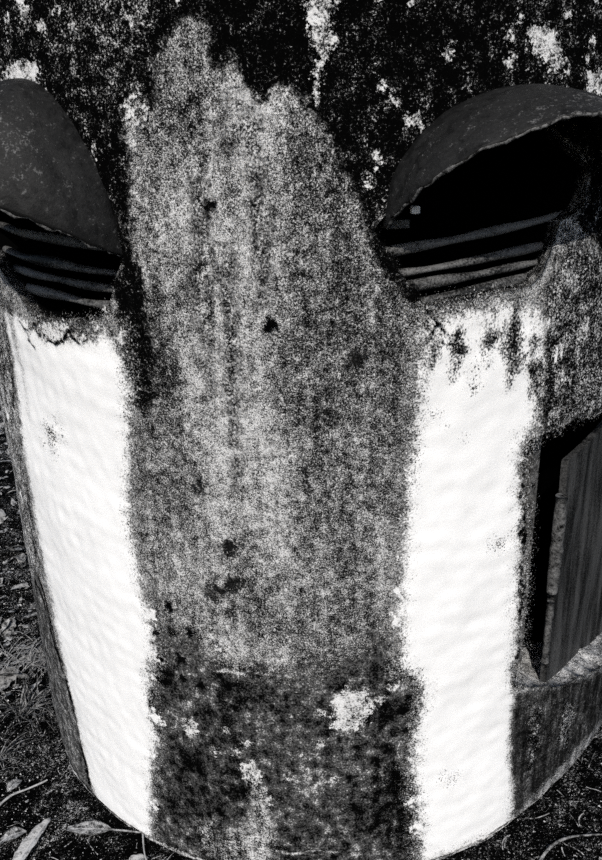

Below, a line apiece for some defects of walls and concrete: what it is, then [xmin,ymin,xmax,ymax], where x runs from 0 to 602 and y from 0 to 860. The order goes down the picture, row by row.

leakage [0,0,602,490]
leakage [190,476,207,494]
leakage [102,601,493,860]